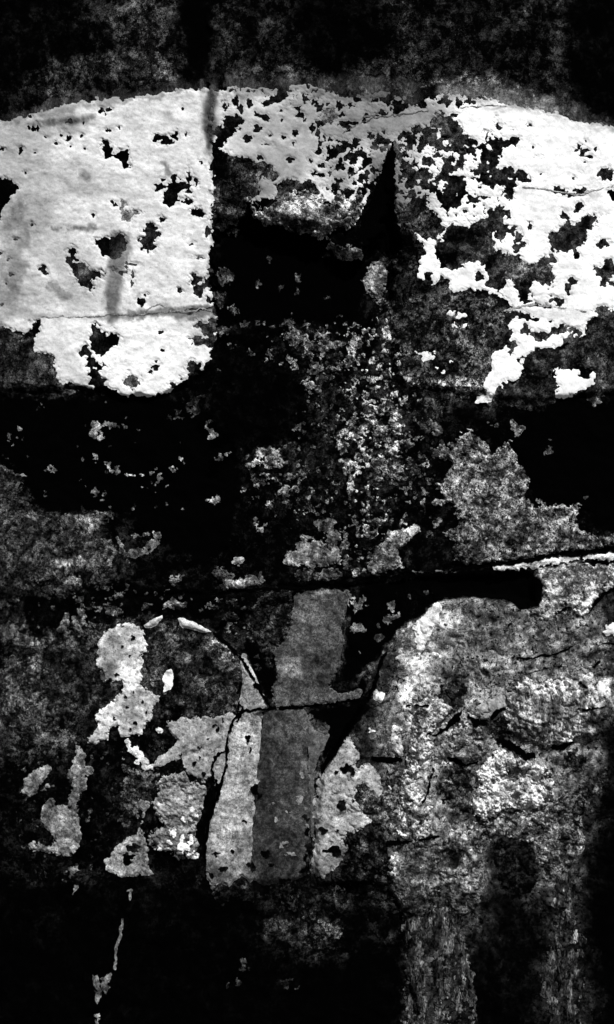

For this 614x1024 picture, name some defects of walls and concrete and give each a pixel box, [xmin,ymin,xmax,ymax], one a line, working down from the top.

crack [41,303,212,318]
peeling [0,81,614,578]
spalling [0,425,294,901]
peeling [373,689,385,703]
peeling [308,714,330,736]
crack [203,632,387,858]
crack [371,756,403,764]
crack [386,835,439,846]